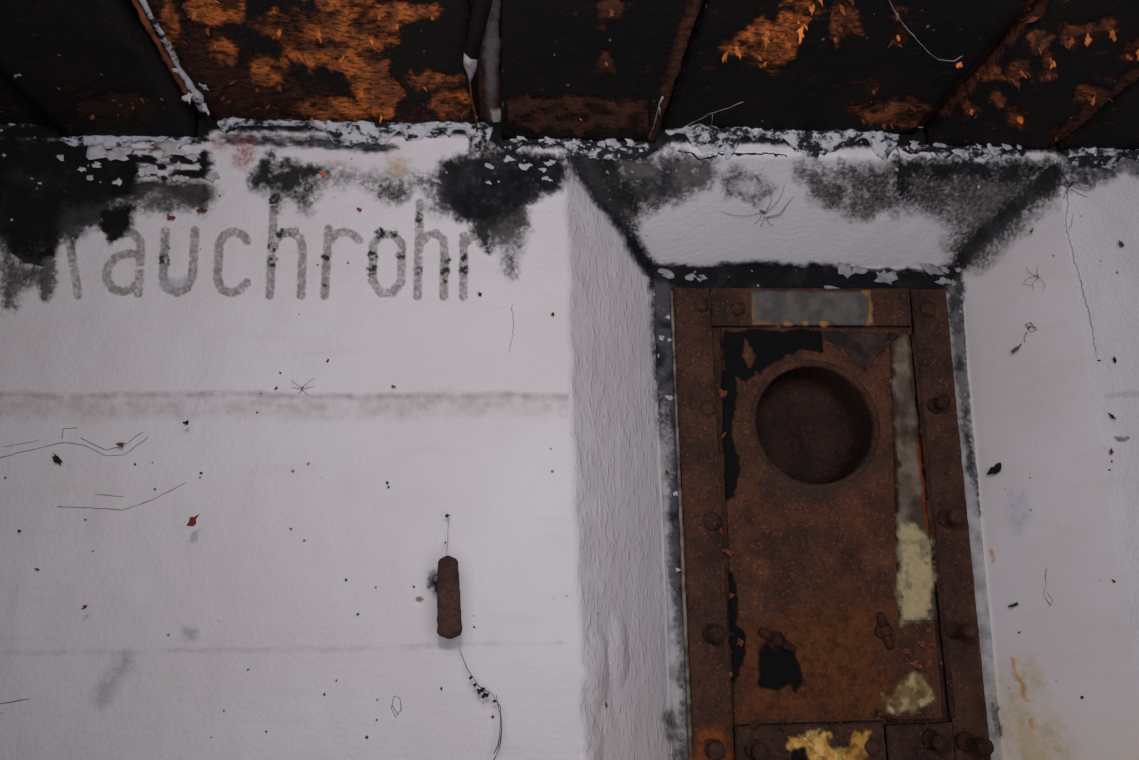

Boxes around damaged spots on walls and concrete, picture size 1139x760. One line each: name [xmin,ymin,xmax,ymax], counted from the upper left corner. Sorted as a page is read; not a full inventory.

corrosion [131,0,472,123]
corrosion [719,0,864,73]
corrosion [850,0,1119,131]
corrosion [1052,38,1139,142]
damp [100,205,135,243]
damp [953,163,1063,269]
damp [41,256,55,301]